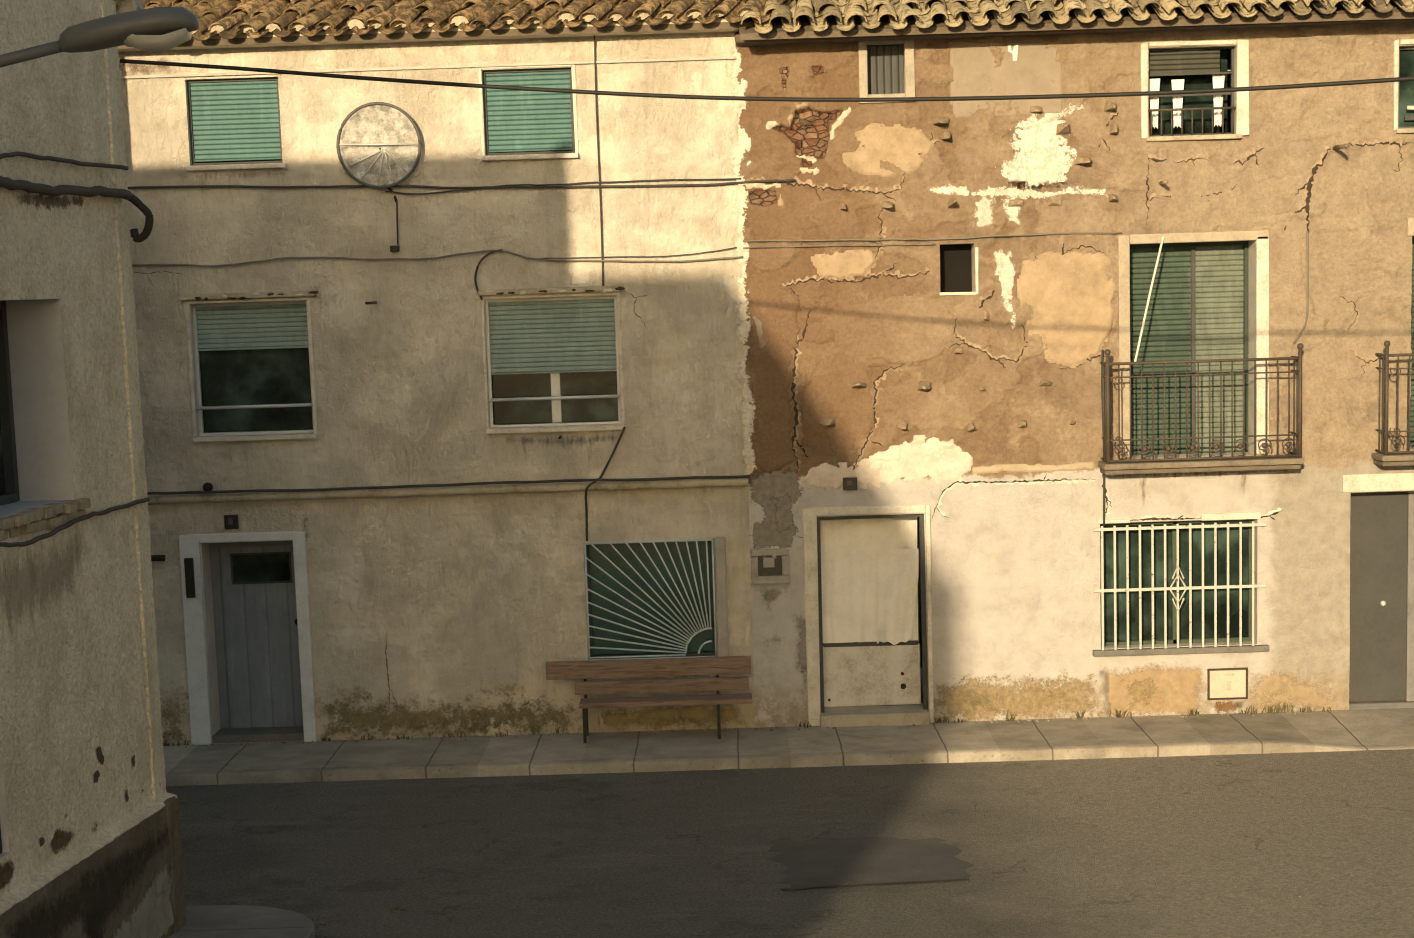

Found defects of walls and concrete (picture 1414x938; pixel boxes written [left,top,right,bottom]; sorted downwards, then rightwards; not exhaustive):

spalling [766,67,851,175]
crack [1099,111,1118,151]
crack [1143,145,1264,223]
crack [1284,139,1412,234]
peeling [729,43,783,475]
crack [1035,242,1104,259]
crack [747,133,940,472]
crack [950,290,1028,368]
crack [1340,296,1404,375]
peeling [799,435,1095,491]
spalling [94,746,104,783]
leakage [9,829,168,938]